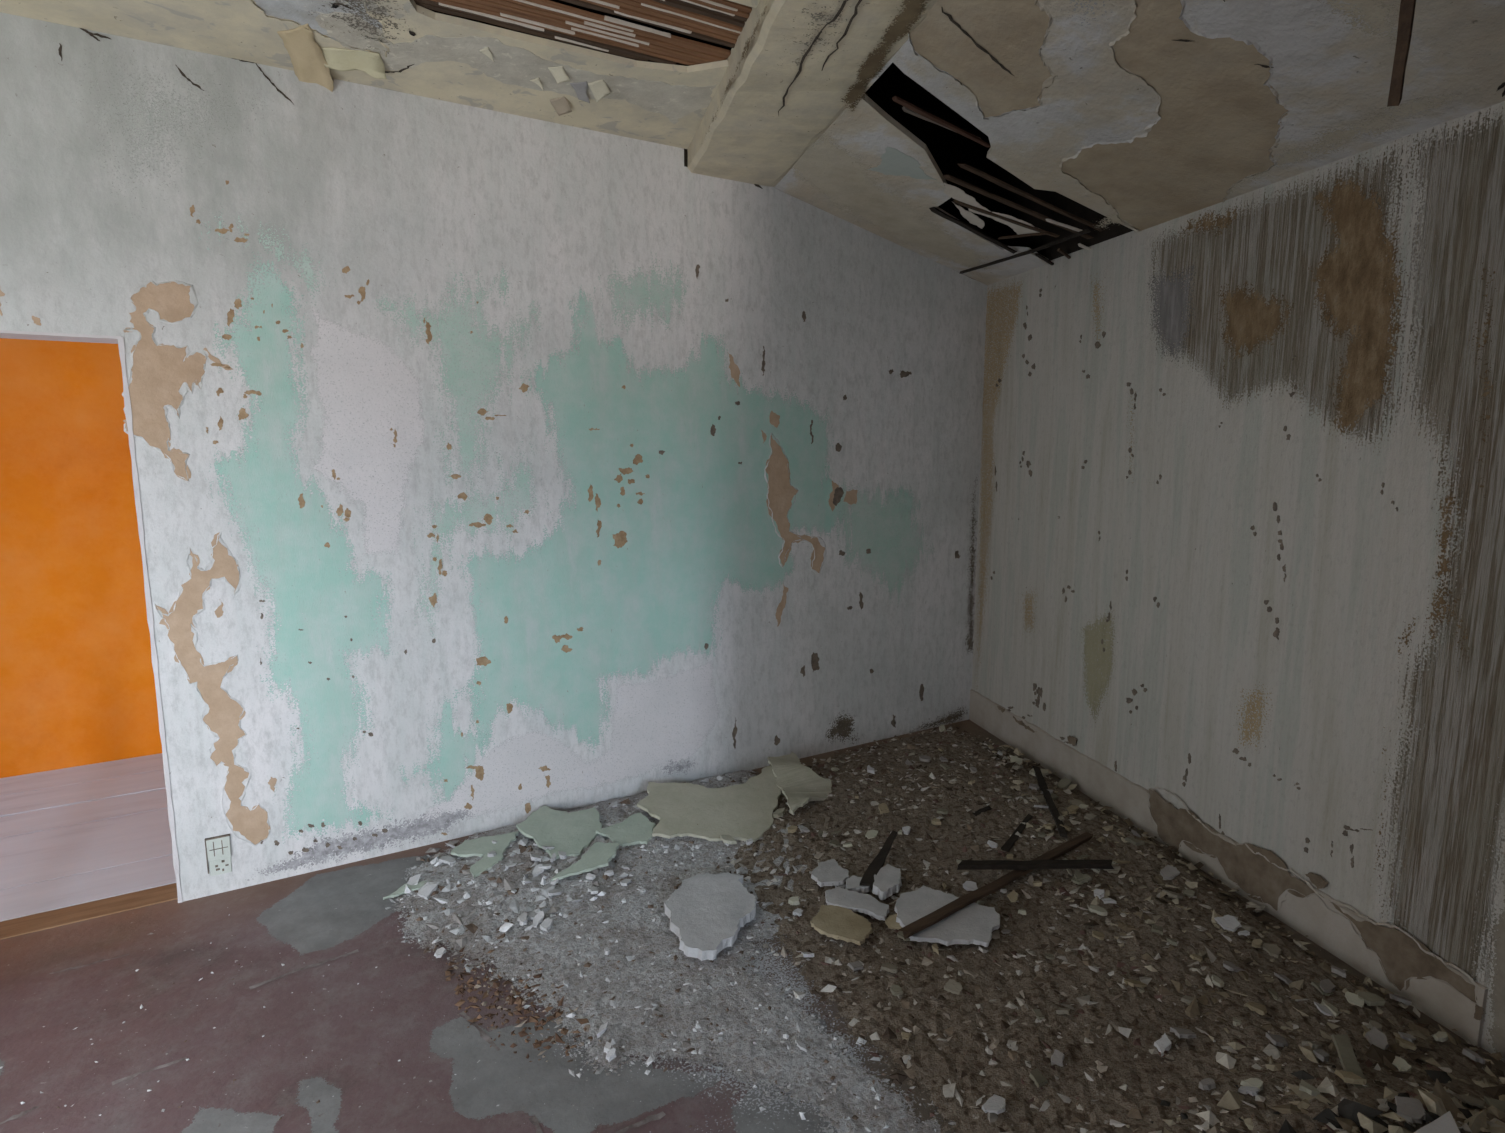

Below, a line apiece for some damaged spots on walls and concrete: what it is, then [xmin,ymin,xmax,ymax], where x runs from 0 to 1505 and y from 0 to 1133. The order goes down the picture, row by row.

peeling [249,0,717,124]
water stain [707,4,767,132]
water stain [840,0,928,111]
water stain [1175,207,1246,239]
water stain [1146,262,1200,366]
peeling [122,280,233,482]
peeling [206,390,262,444]
peeling [298,493,351,522]
peeling [761,411,845,627]
peeling [828,481,858,511]
peeling [1059,0,1505,1062]
peeling [154,525,485,956]